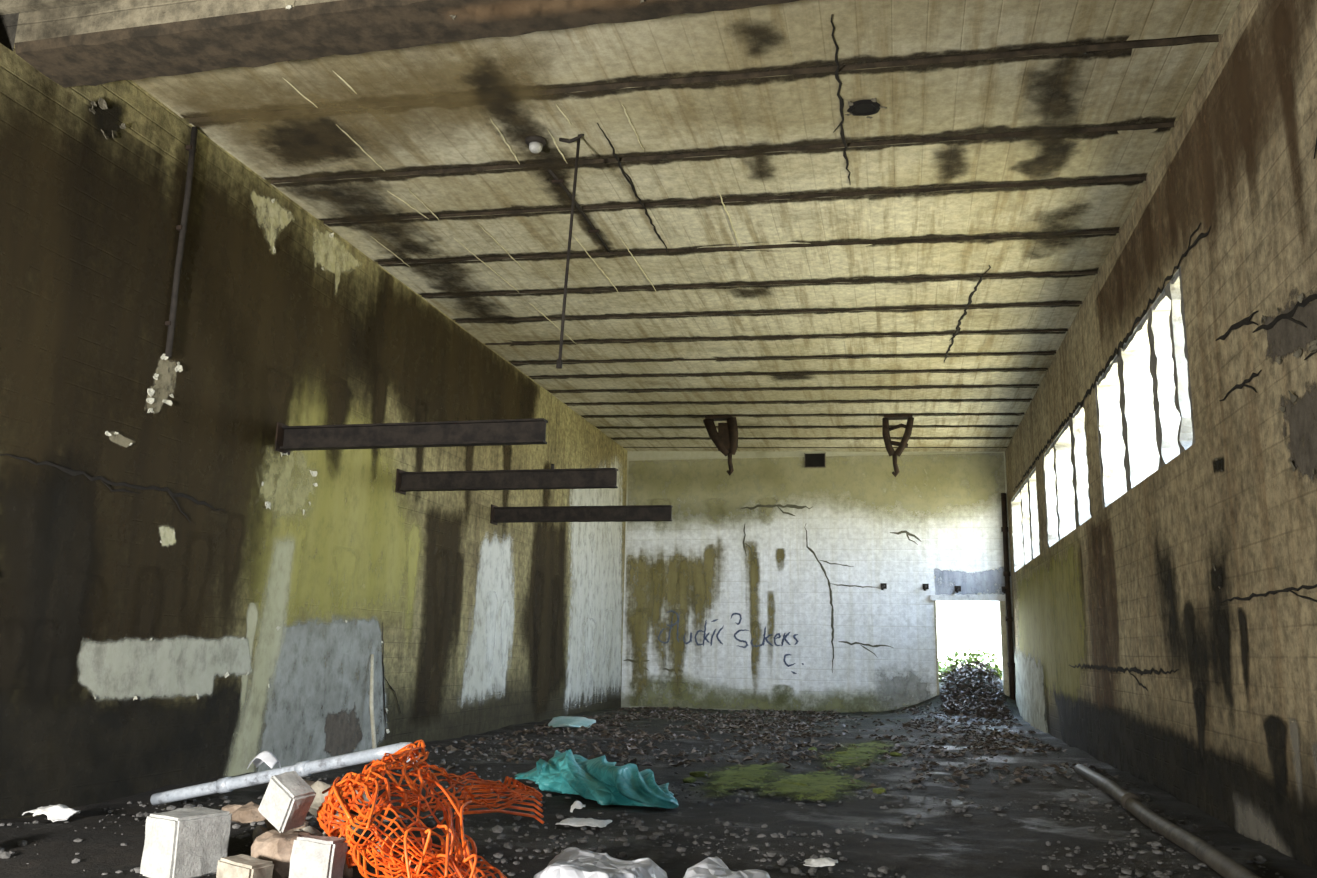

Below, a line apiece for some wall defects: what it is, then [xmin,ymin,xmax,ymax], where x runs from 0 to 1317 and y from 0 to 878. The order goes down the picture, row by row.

leakage [181,34,1219,187]
crack [831,14,851,185]
leakage [1097,0,1312,341]
peeling [144,354,183,413]
leakage [0,85,1176,819]
crack [944,265,991,362]
crack [1219,370,1261,401]
crack [1215,294,1317,360]
crack [740,504,893,673]
crack [1220,584,1317,603]
crack [1069,663,1179,691]
leakage [1054,545,1317,870]